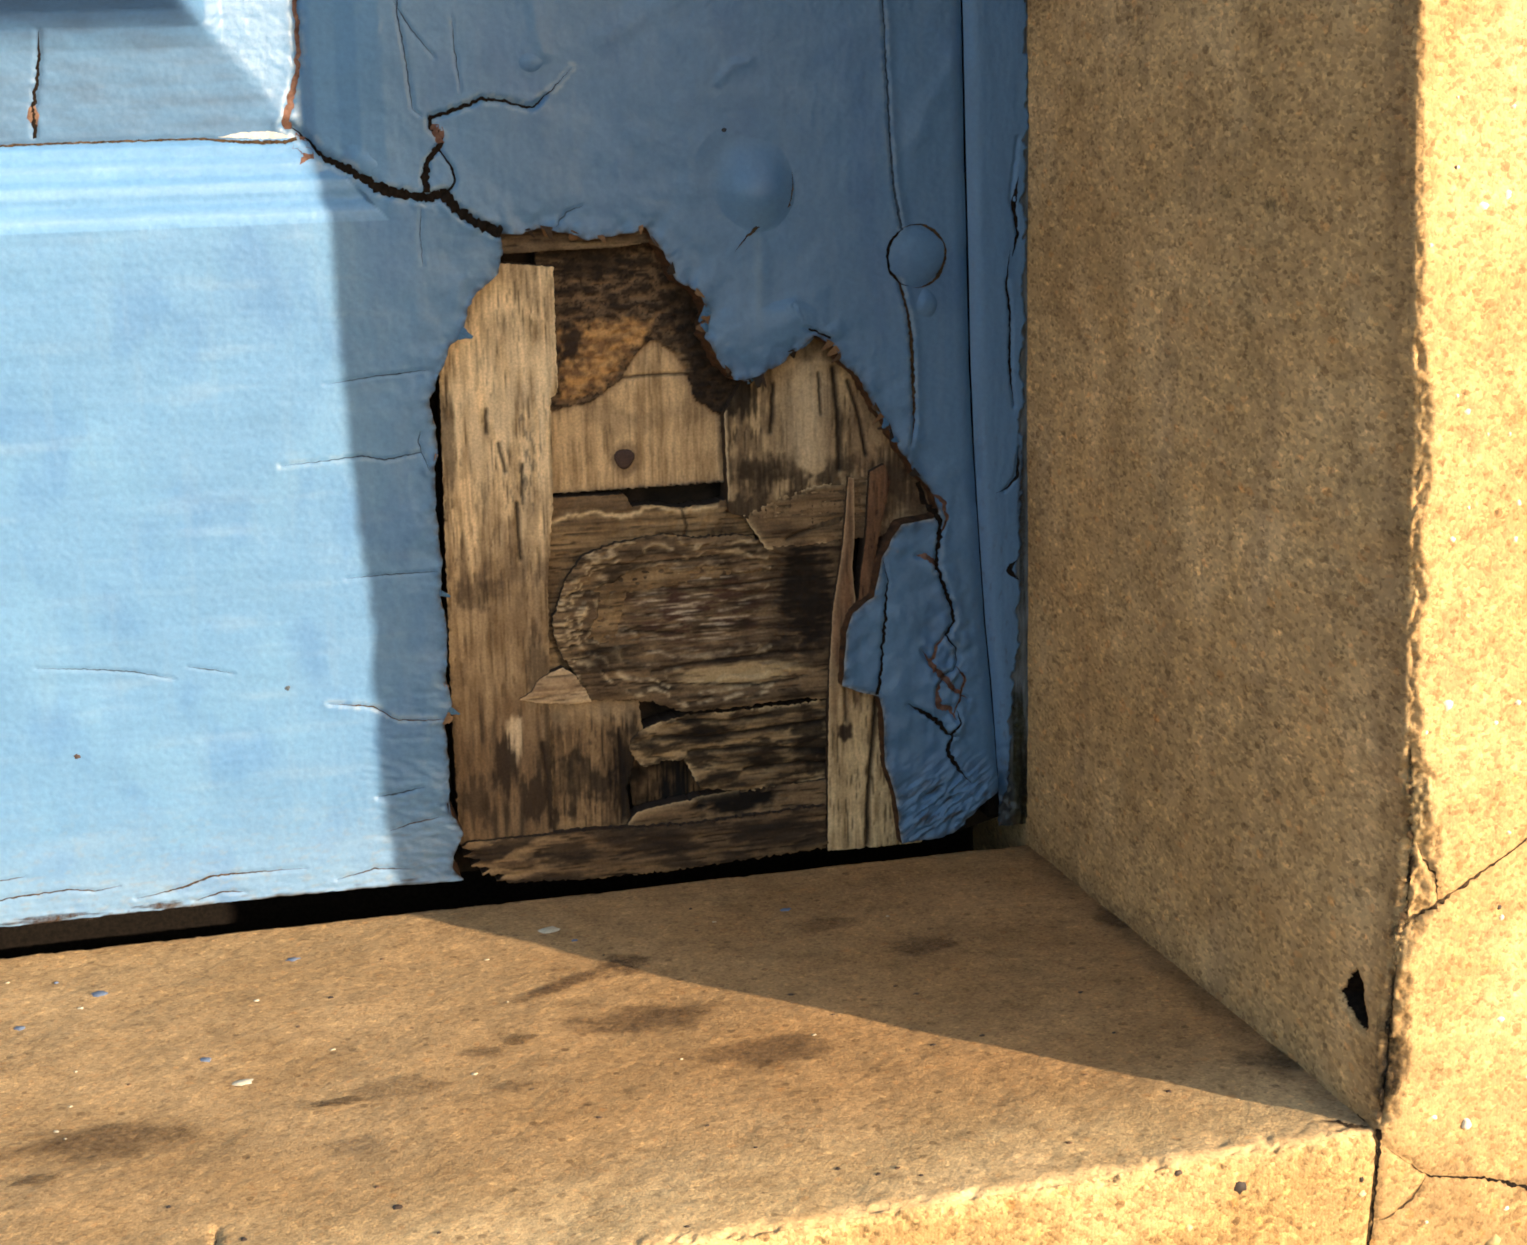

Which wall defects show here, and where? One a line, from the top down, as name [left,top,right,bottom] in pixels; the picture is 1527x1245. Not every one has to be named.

crack [0,0,565,262]
peeling [456,327,473,340]
peeling [525,225,579,241]
peeling [695,288,712,332]
crack [898,283,916,443]
crack [875,481,971,783]
crack [1324,777,1527,1245]